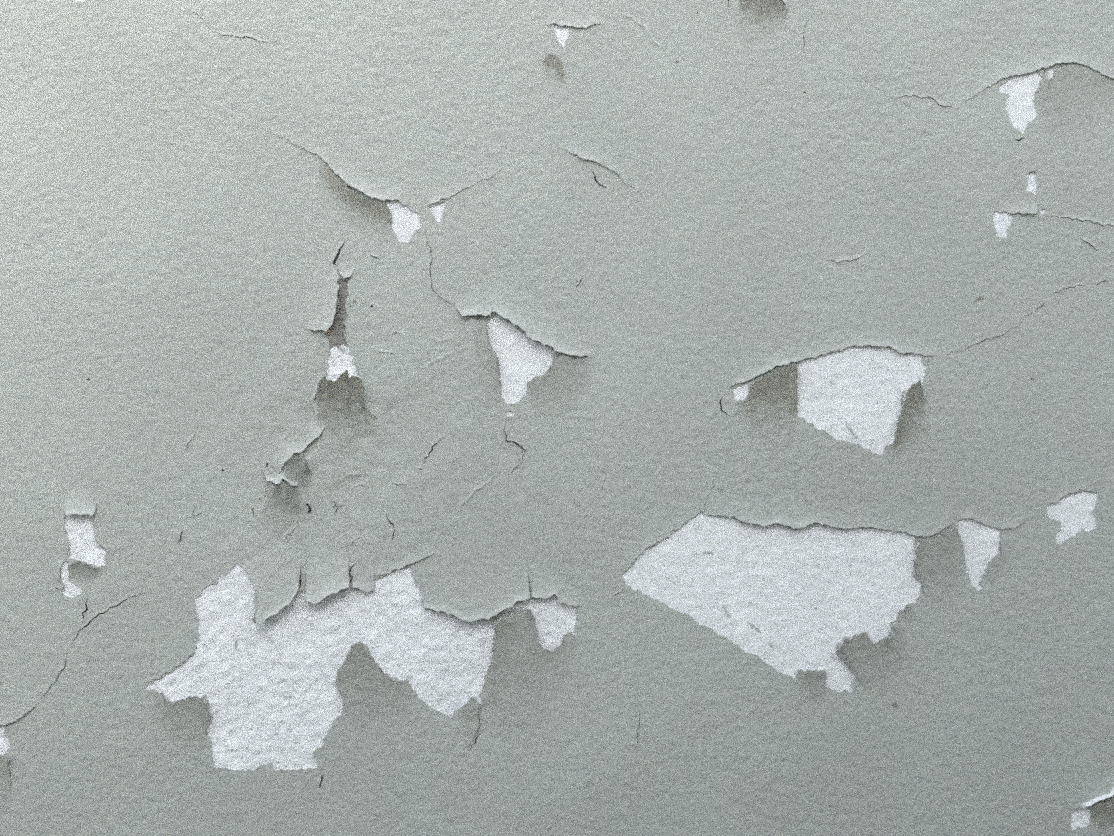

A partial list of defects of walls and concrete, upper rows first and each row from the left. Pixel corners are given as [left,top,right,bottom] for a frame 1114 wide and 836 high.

peeling [542,10,603,88]
peeling [724,0,792,43]
peeling [960,44,1114,141]
peeling [993,163,1114,238]
crack [941,278,1110,355]
peeling [720,328,940,458]
peeling [145,122,595,771]
peeling [48,486,119,599]
peeling [613,472,1025,705]
peeling [1047,480,1098,544]
crack [7,591,147,726]
peeling [1064,769,1114,836]